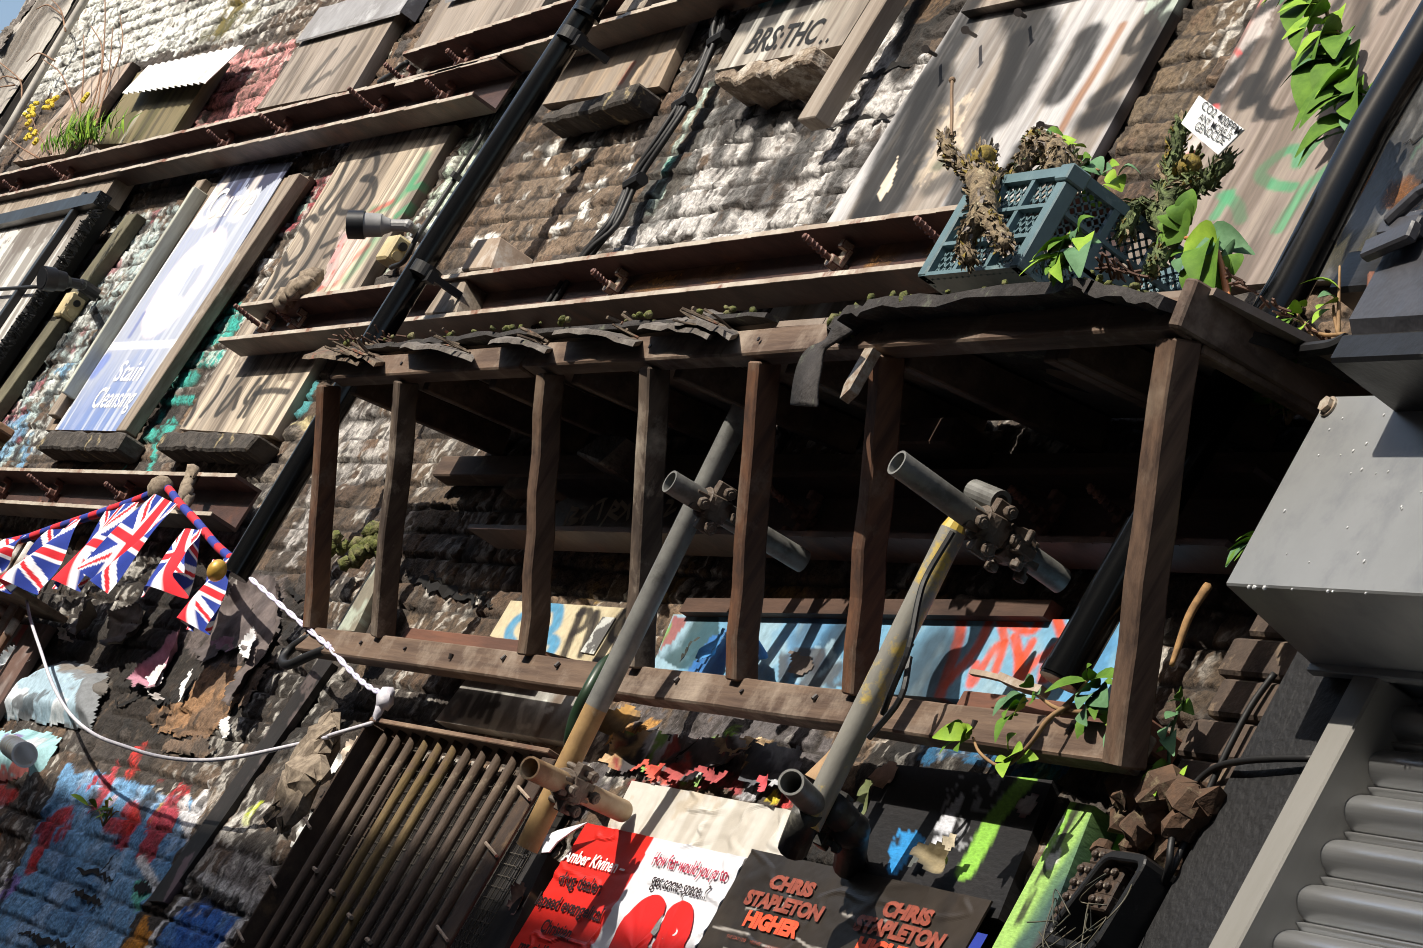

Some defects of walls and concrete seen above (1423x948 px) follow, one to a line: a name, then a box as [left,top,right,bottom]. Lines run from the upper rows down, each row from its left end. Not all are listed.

peeling [124,572,283,758]
peeling [598,704,803,792]